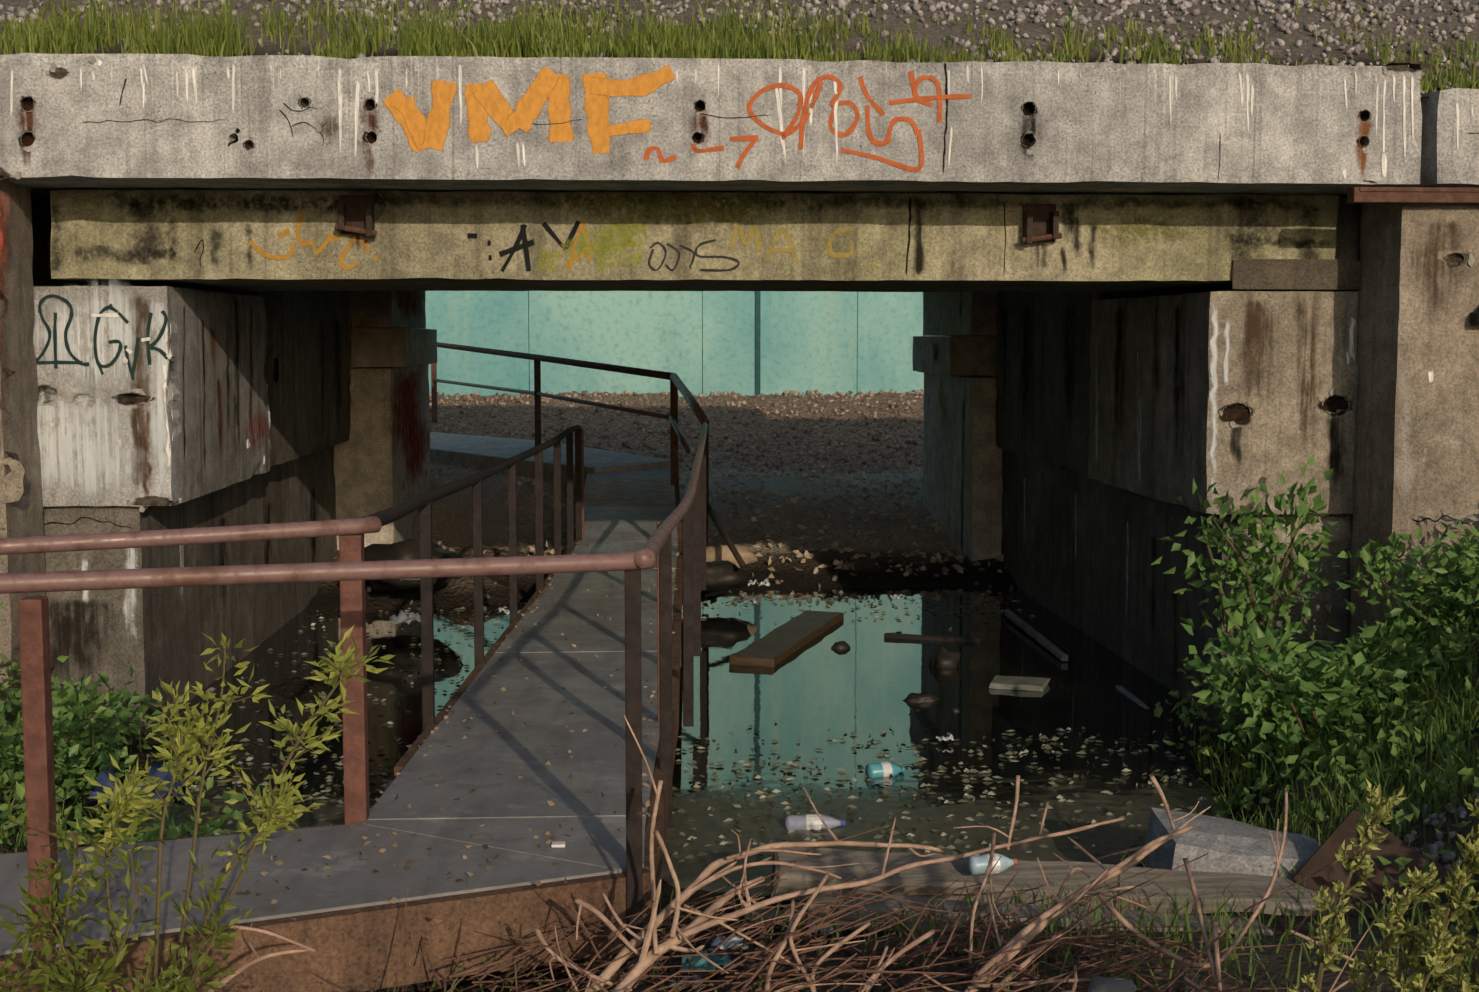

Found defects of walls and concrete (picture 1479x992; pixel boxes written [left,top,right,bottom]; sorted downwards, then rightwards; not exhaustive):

corrosion [1356,111,1371,171]
leakage [52,192,216,269]
leakage [211,231,219,263]
leakage [756,196,1324,273]
corrosion [0,201,15,377]